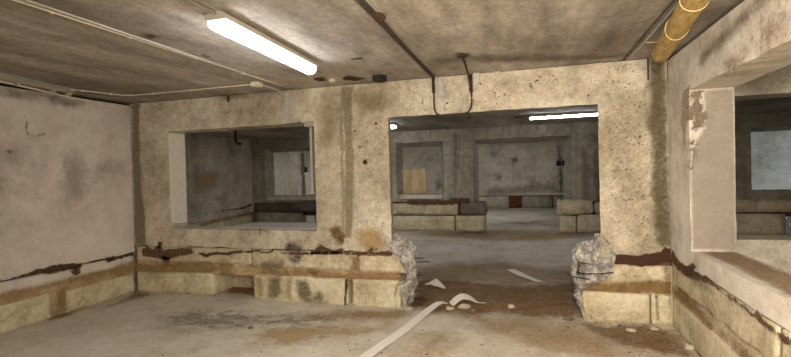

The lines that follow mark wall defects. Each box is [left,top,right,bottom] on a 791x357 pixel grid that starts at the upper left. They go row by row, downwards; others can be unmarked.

leakage [262,243,322,301]
spalling [362,199,431,307]
spalling [570,233,671,316]
rust [673,288,711,329]